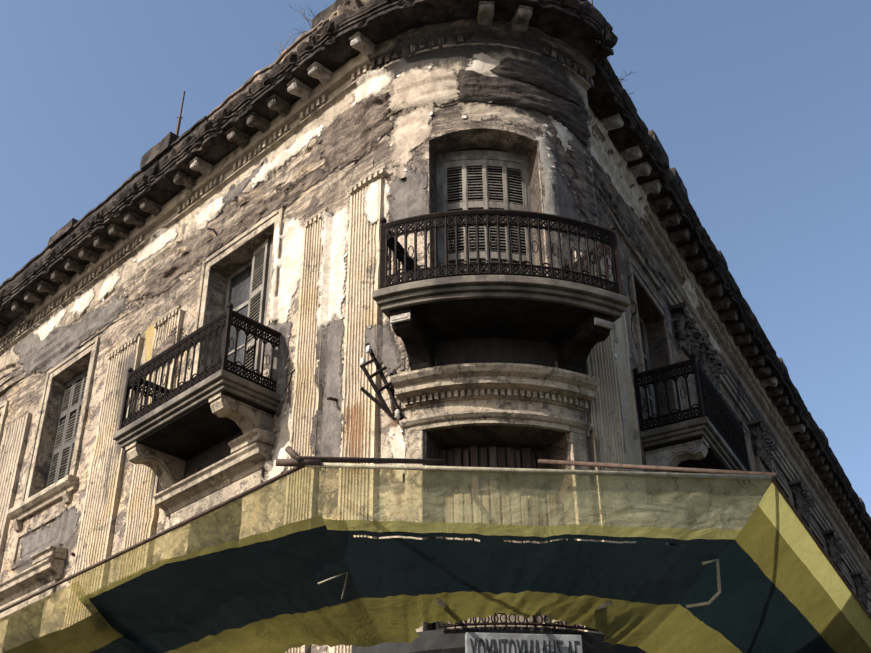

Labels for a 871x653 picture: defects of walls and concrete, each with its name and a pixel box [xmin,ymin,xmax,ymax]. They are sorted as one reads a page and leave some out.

spalling [13,52,649,482]
crack [623,260,638,349]
rust [346,405,362,464]